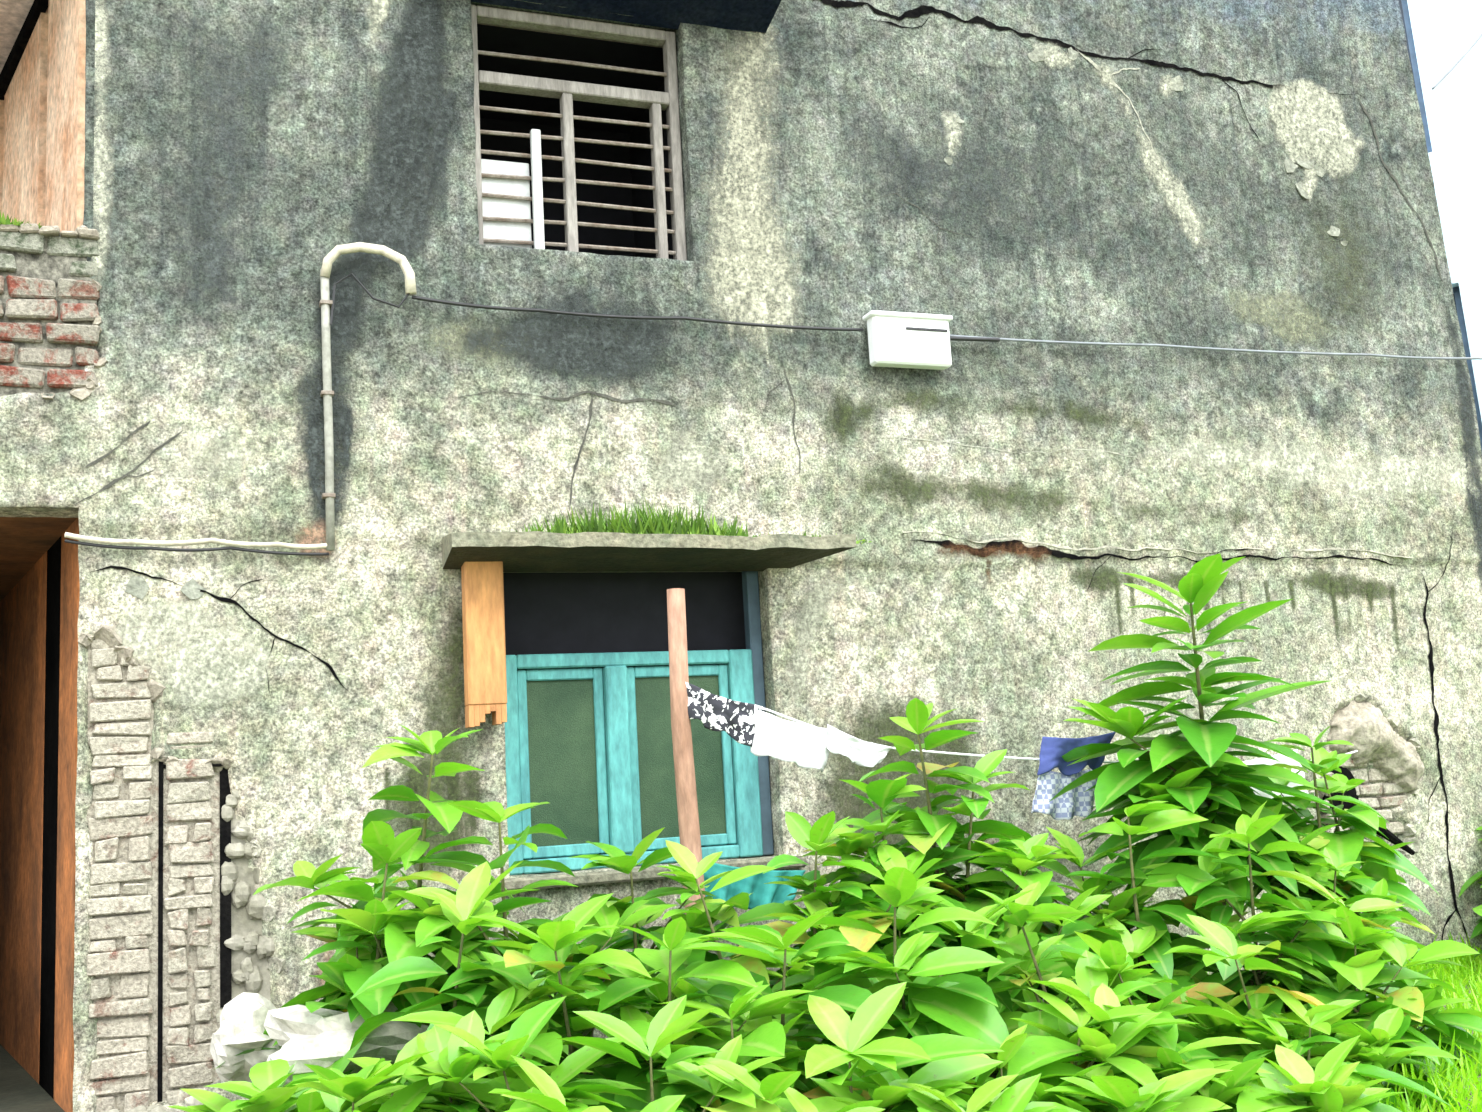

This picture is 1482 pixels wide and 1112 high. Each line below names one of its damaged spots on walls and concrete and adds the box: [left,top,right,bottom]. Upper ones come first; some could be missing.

crack [821,0,1285,185]
peeling [1269,81,1362,199]
spalling [0,223,108,400]
crack [87,566,351,694]
spalling [78,576,285,1112]
crack [903,530,1468,941]
spalling [1309,693,1424,855]